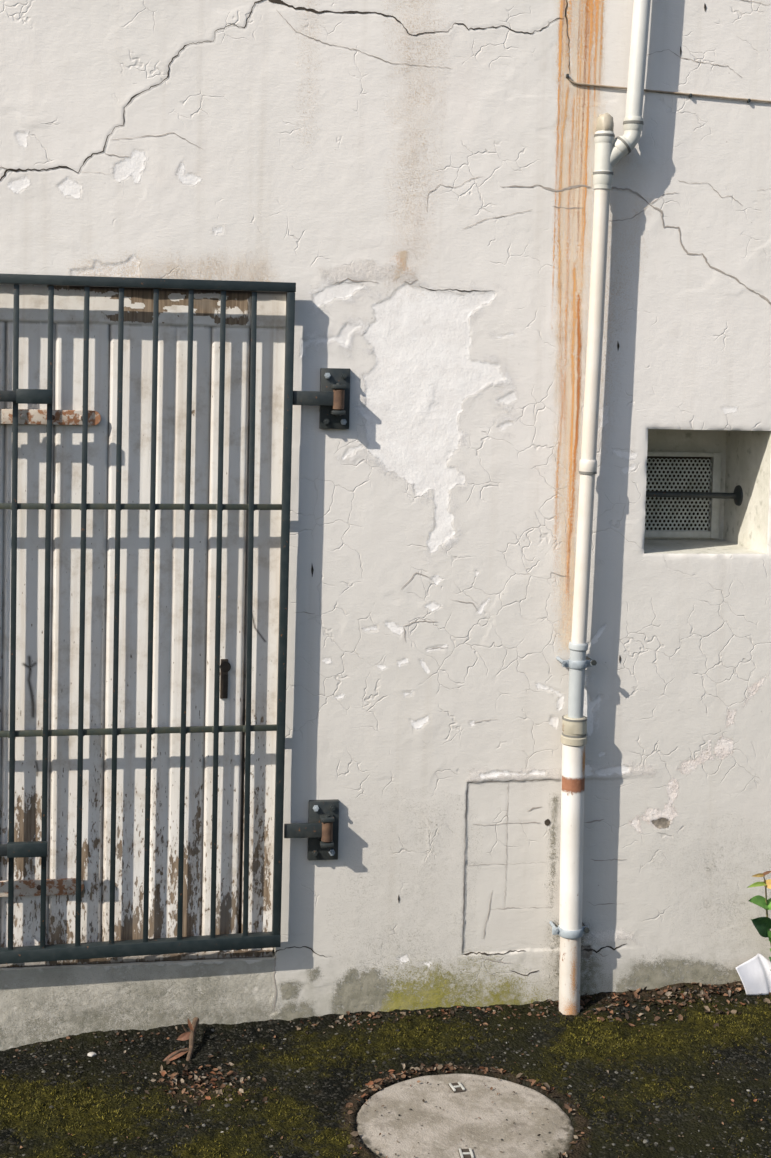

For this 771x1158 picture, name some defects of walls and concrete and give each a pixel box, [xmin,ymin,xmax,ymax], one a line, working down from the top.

crack [0,0,570,181]
peeling [71,254,140,277]
crack [330,278,494,292]
corrosion [549,0,608,655]
crack [427,177,771,305]
peeling [294,271,529,586]
peeling [479,769,545,779]
corrosion [562,747,585,794]
peeling [629,673,769,834]
leakage [0,788,505,1051]
crack [462,779,552,976]
crack [583,944,625,957]